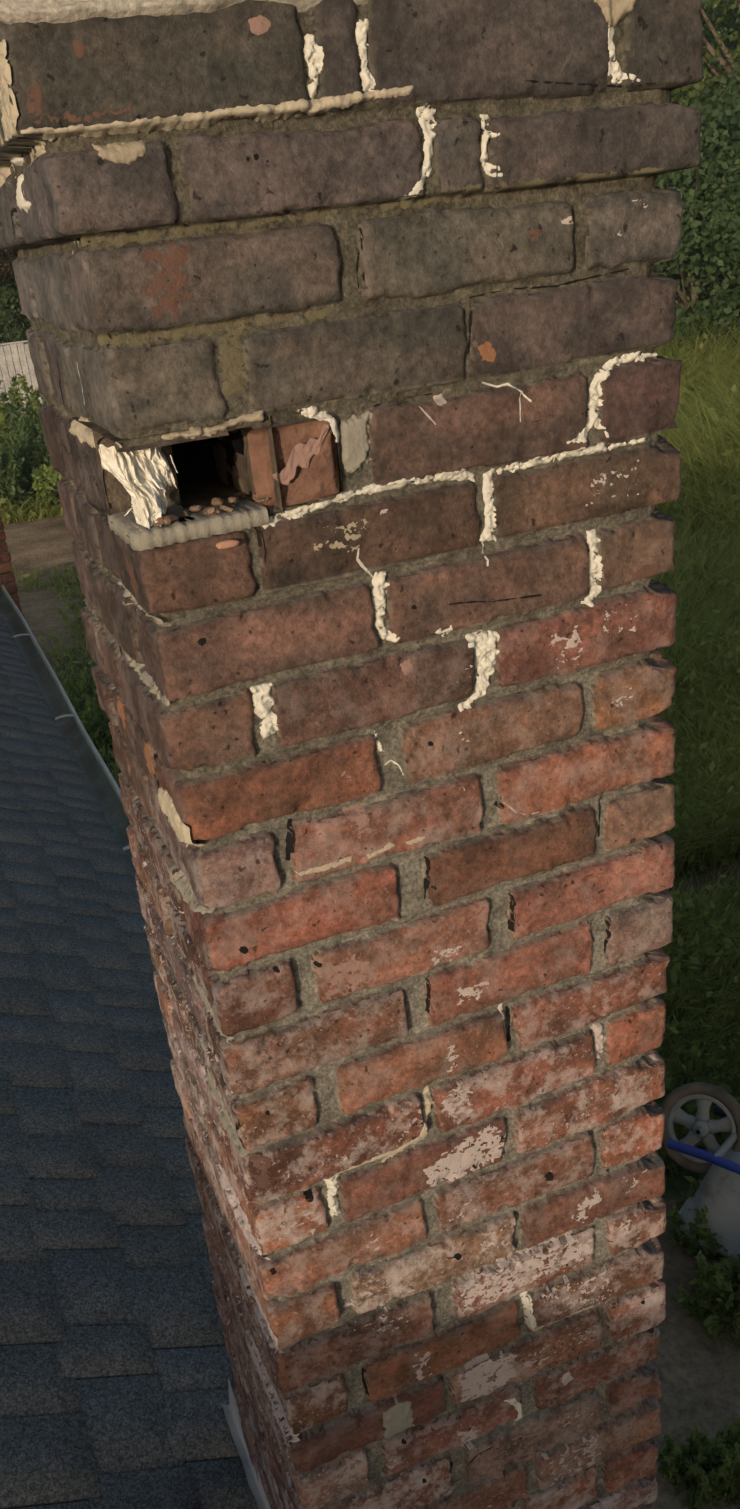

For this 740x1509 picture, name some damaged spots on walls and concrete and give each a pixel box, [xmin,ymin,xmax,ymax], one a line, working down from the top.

water stain [433,394,447,406]
spalling [72,416,341,541]
water stain [586,460,639,506]
peeling [216,539,240,549]
water stain [400,659,413,675]
efflorescence [551,625,586,669]